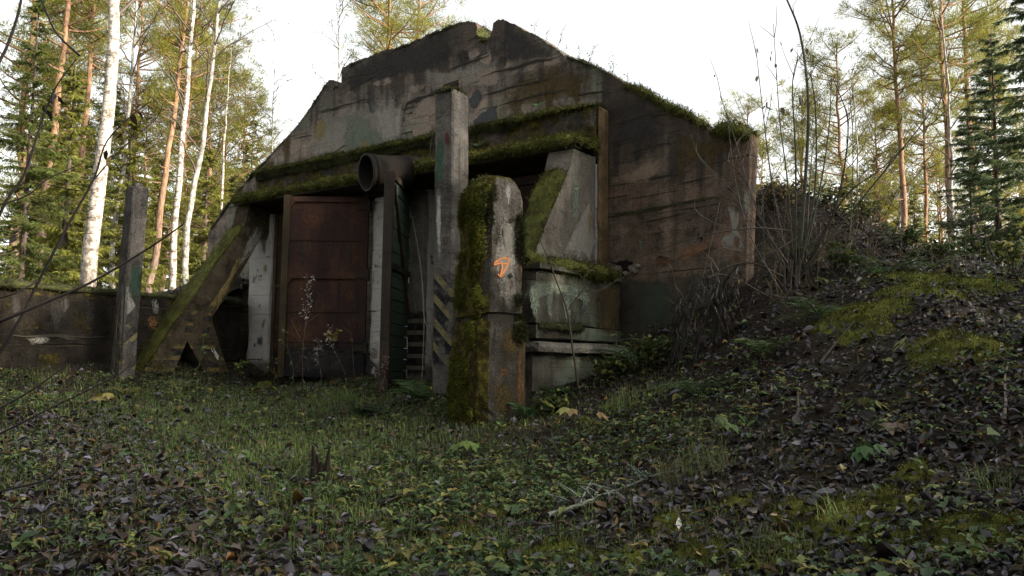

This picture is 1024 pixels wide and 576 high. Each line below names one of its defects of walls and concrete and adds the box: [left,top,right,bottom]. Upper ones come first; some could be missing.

leakage [314,105,401,152]